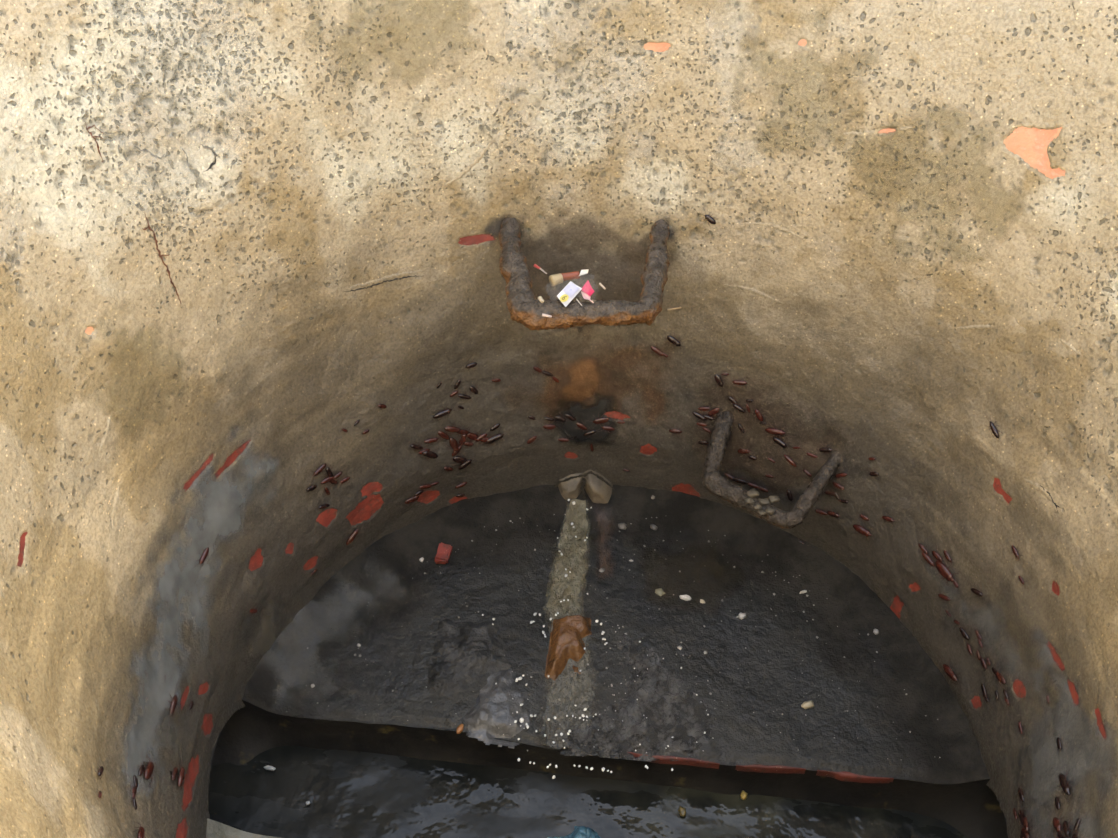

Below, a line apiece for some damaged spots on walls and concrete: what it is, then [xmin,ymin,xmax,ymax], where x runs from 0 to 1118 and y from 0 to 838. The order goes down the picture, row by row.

flaking render [1003,126,1066,179]
crack [142,214,182,309]
leakage [125,456,275,790]